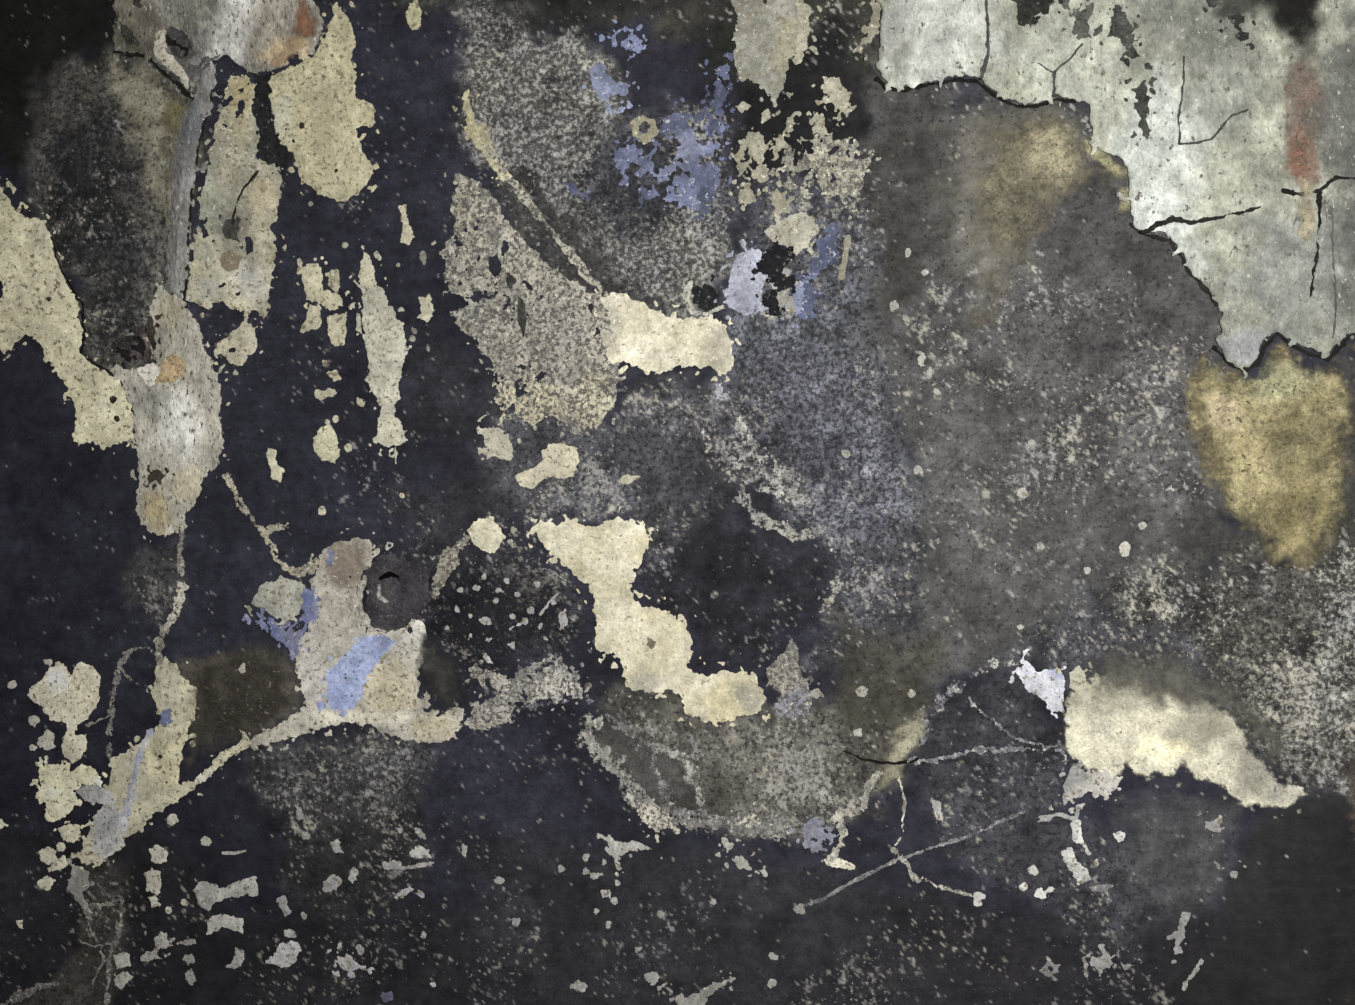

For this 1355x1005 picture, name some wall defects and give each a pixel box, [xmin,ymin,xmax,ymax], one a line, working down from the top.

flaking render [0,0,742,548]
spalling [690,0,881,328]
crack [874,0,1083,108]
flaking render [853,0,1355,380]
crack [1177,56,1249,145]
crack [1129,175,1355,372]
damp [1187,345,1351,569]
flaking render [7,528,469,919]
flaking render [430,506,824,734]
crack [826,696,1067,897]
flaking render [1037,661,1306,902]
peeling [113,844,258,989]